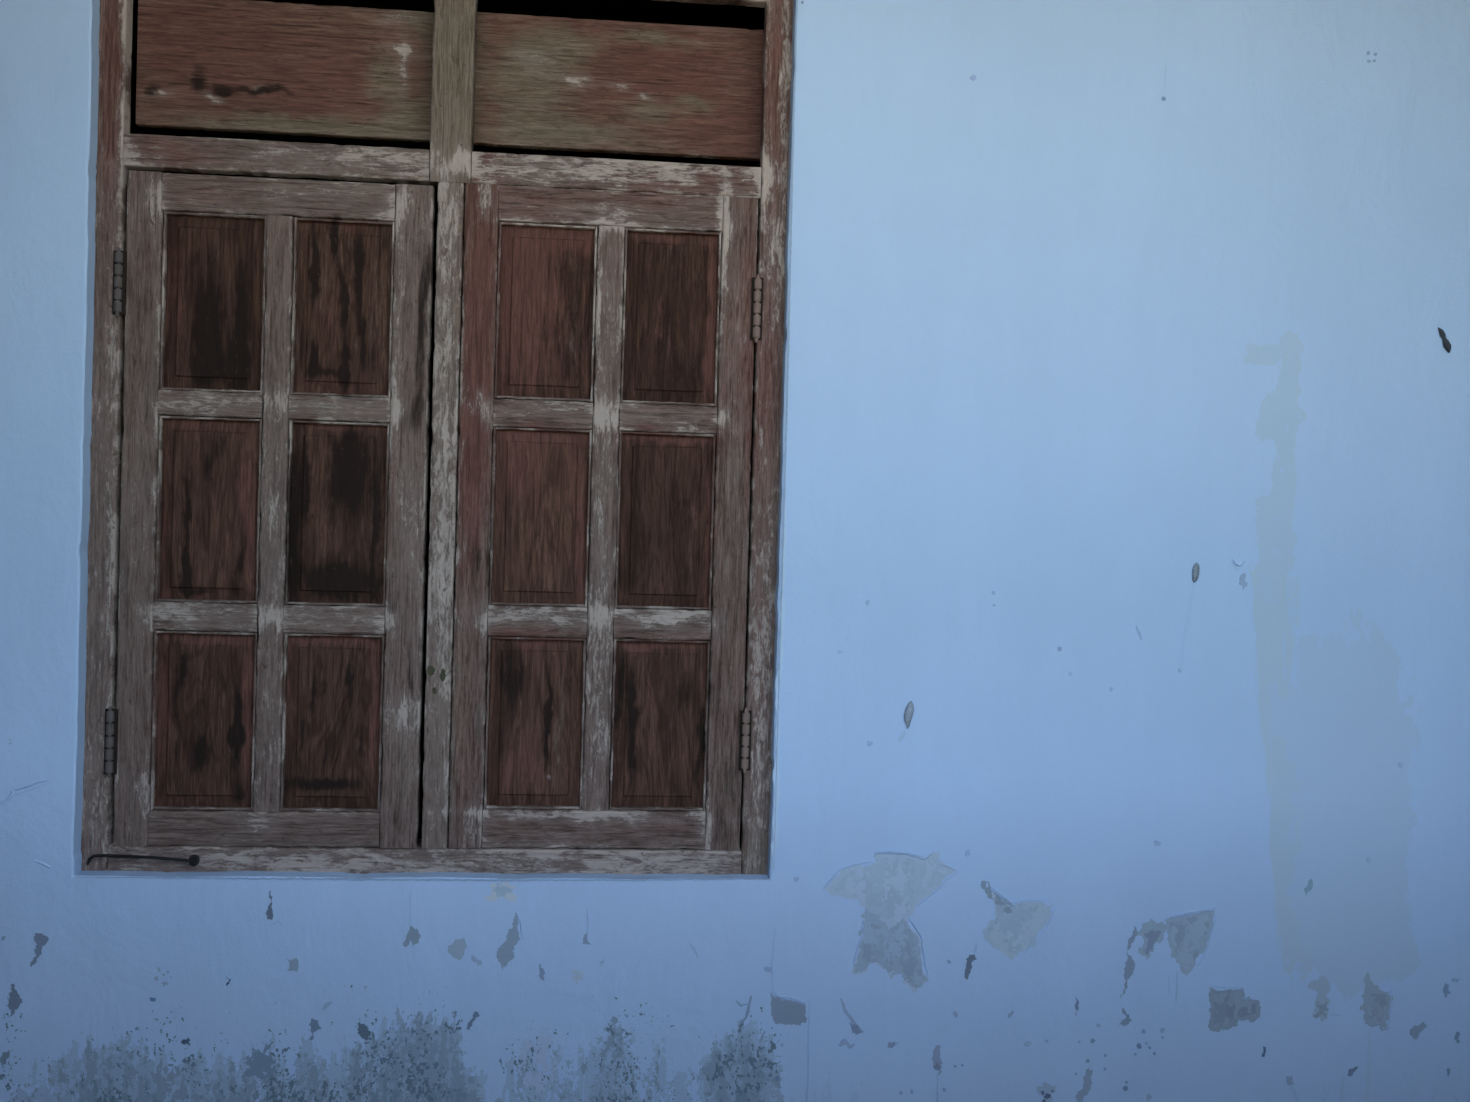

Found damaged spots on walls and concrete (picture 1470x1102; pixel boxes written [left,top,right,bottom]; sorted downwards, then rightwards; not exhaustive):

peeling [448,913,520,970]
peeling [823,851,956,993]
spalling [964,881,1054,980]
peeling [1120,910,1215,1026]
peeling [771,993,807,1025]
peeling [1208,987,1261,1032]
peeling [1359,972,1393,1029]
peeling [0,1050,10,1080]